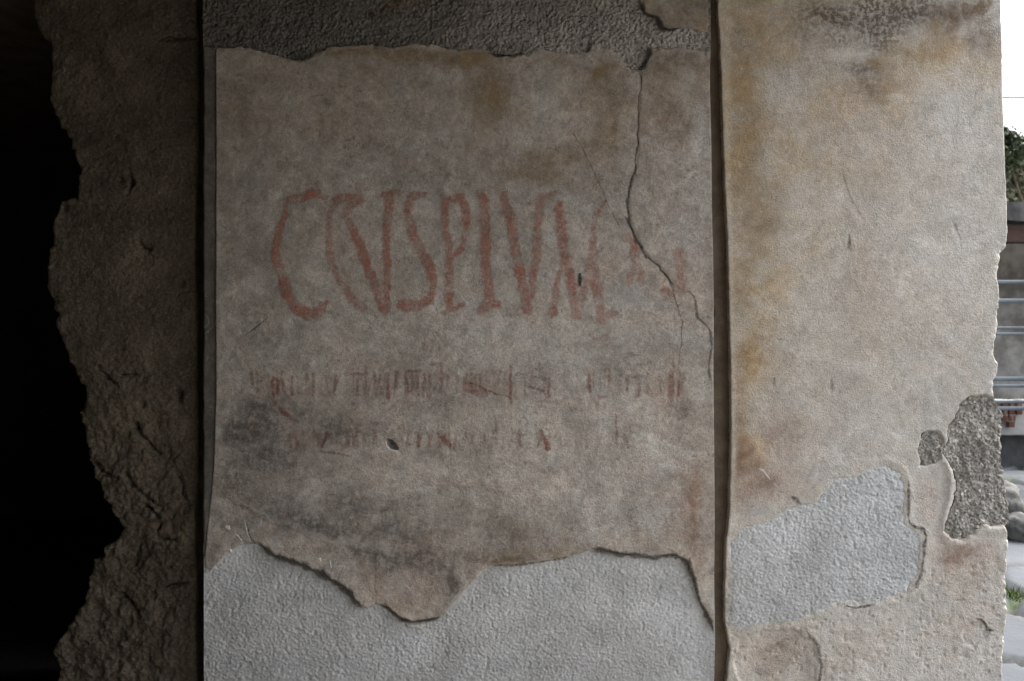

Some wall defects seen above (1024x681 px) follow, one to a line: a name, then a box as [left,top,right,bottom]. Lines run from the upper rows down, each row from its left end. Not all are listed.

flaking render [203,0,711,71]
crack [605,4,715,377]
flaking render [204,466,920,681]
flaking render [918,395,1010,540]